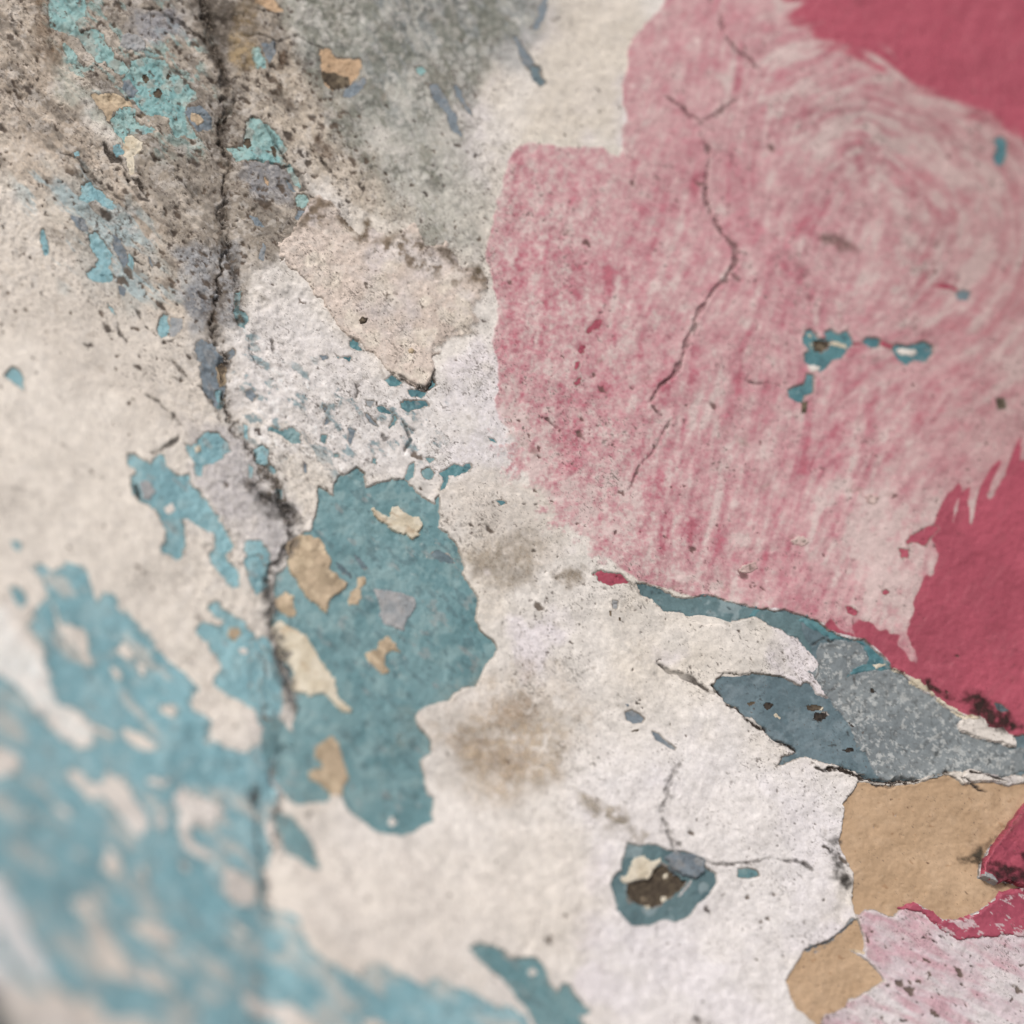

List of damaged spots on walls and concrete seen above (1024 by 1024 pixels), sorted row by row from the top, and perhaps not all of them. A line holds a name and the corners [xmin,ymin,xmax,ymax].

peeling [254,0,283,13]
peeling [48,0,212,175]
peeling [251,39,276,69]
peeling [79,182,117,210]
peeling [40,230,49,256]
peeling [70,215,134,296]
crack [181,0,304,721]
peeling [788,330,931,413]
peeling [899,526,939,559]
peeling [0,425,590,1024]
peeling [593,570,1024,1024]
crack [249,762,283,925]